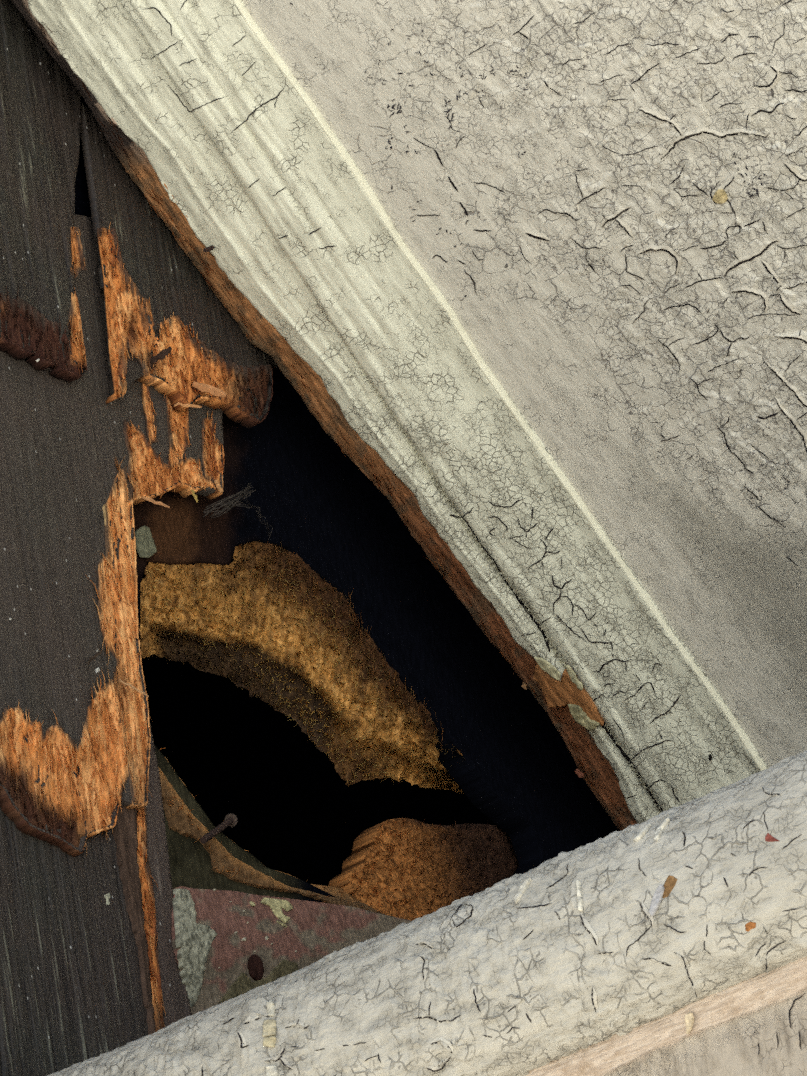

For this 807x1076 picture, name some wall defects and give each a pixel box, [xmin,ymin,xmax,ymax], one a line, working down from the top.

crack [142,0,256,112]
crack [232,86,285,132]
crack [412,116,505,295]
crack [519,0,807,452]
crack [717,417,786,528]
crack [487,498,681,760]
peeling [533,657,605,731]
peeling [173,889,217,1008]
peeling [249,898,293,928]
crack [224,939,531,1076]
peeling [514,877,532,904]
crack [521,864,710,997]